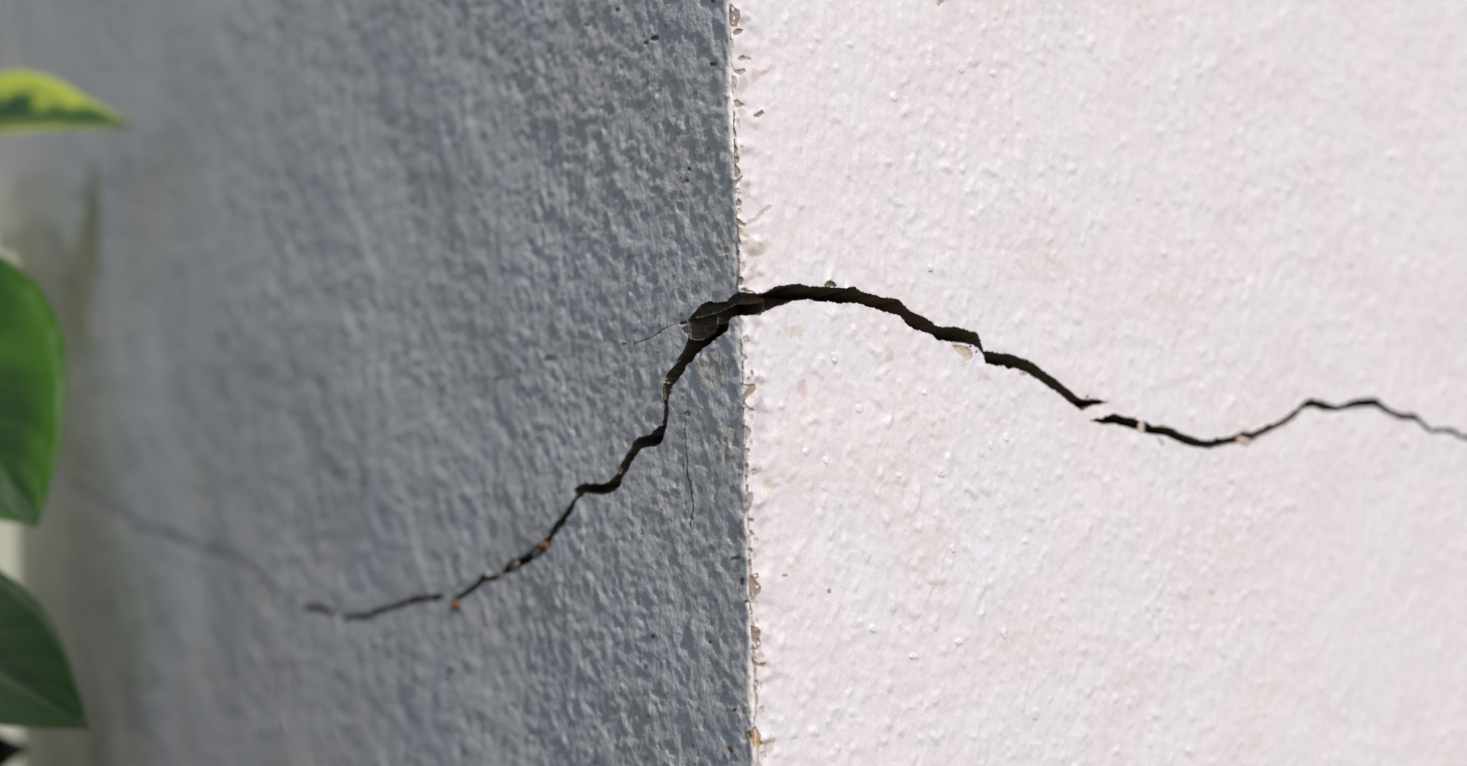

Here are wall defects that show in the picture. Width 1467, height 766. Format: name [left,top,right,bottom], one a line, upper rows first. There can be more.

crack [286,283,1467,621]